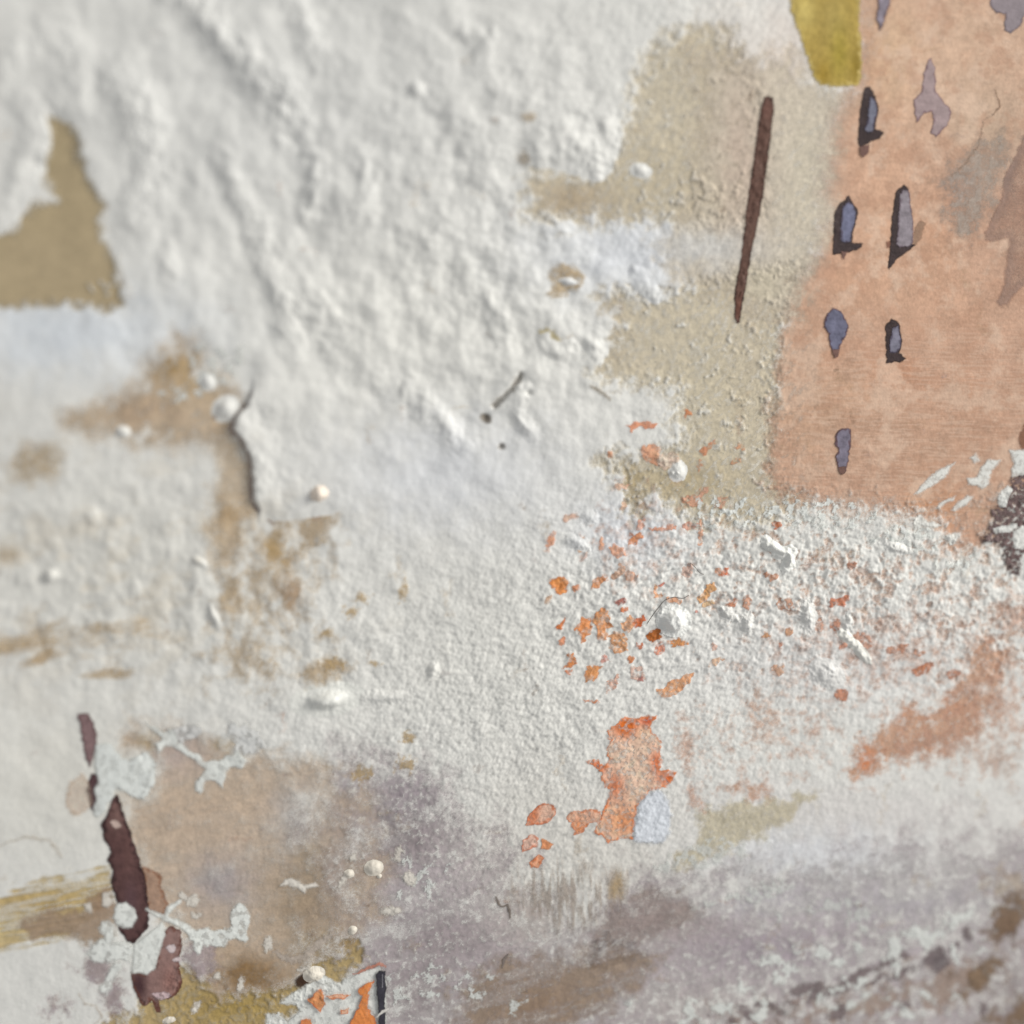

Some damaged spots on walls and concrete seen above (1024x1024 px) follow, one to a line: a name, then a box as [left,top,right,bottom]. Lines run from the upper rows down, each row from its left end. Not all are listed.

peeling [0,116,124,314]
crack [213,392,275,525]
peeling [266,962,387,1024]